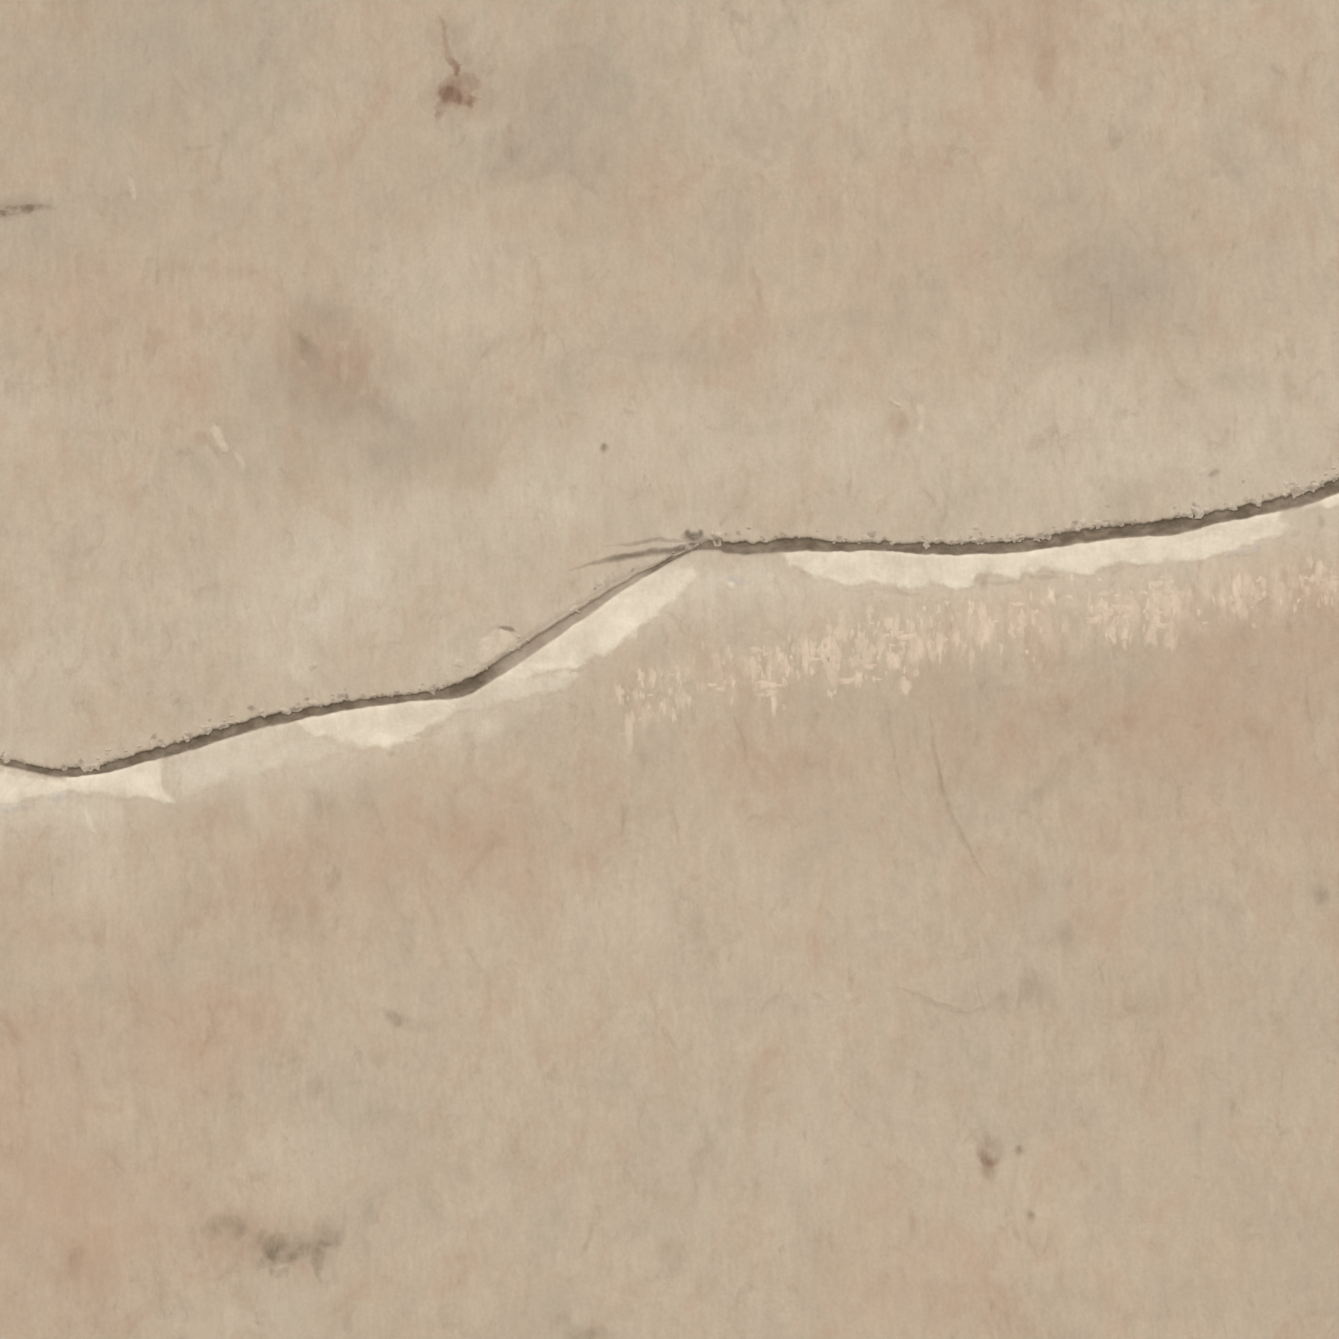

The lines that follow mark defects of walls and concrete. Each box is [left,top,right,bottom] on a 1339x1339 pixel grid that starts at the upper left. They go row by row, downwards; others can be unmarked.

crack [0,456,1339,779]